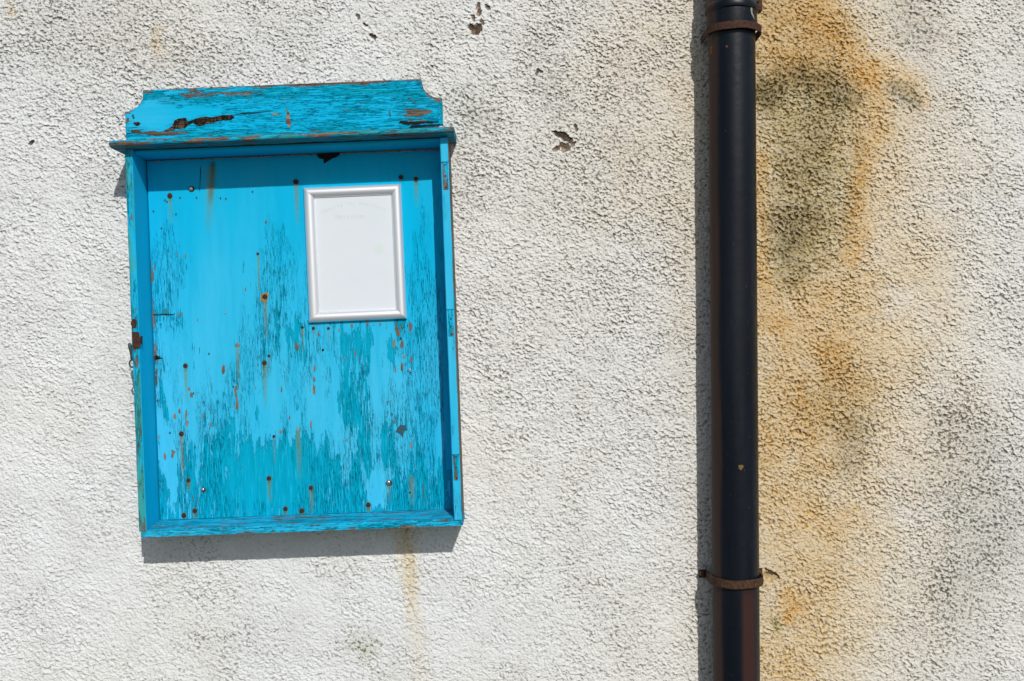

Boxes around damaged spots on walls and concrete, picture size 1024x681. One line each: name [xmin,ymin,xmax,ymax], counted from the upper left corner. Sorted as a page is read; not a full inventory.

spalling [468,2,491,35]
spalling [553,124,578,153]